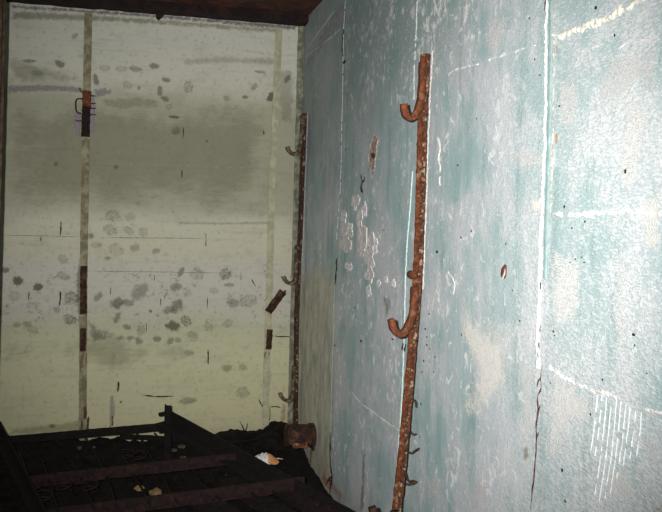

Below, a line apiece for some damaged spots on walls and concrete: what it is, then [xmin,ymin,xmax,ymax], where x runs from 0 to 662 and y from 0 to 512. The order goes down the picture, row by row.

spalling [368,134,379,174]
peeling [339,195,396,297]
crack [530,328,542,511]